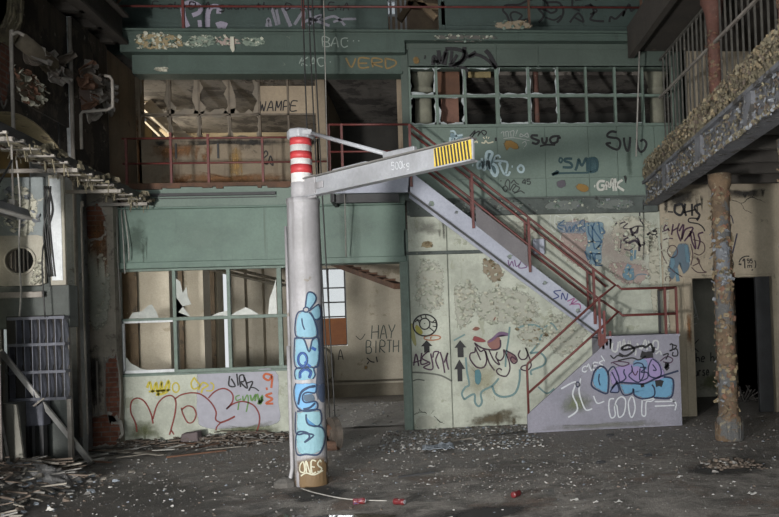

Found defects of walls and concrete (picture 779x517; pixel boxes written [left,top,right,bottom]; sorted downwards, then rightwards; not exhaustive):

peeling [0,42,119,124]
peeling [454,258,588,356]
peeling [707,186,741,418]
spalling [92,353,124,447]